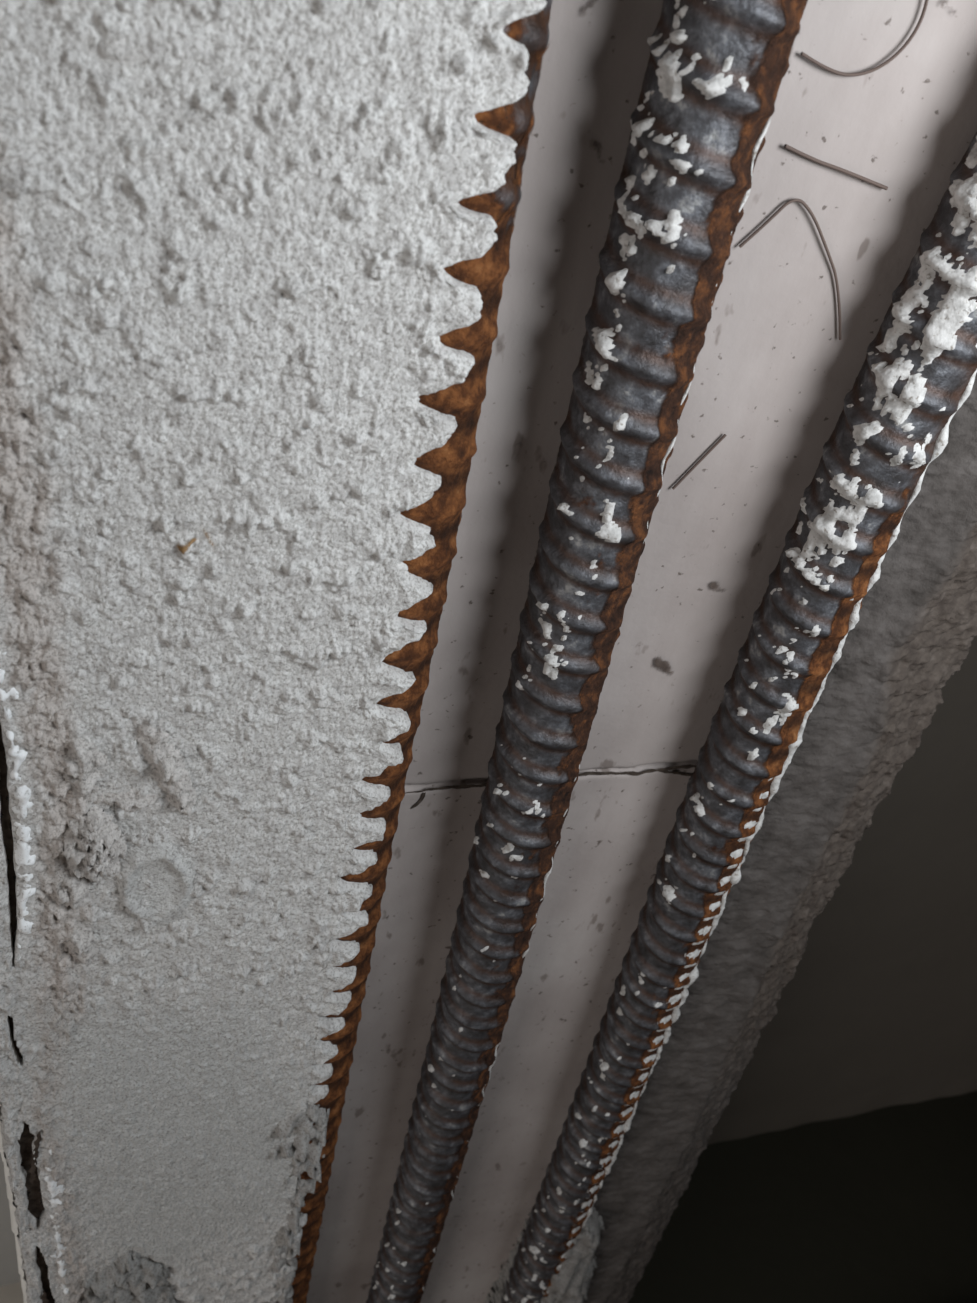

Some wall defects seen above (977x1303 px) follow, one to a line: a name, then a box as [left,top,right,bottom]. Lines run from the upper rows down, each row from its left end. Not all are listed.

crack [0,723,17,947]
crack [8,1016,23,1059]
peeling [0,651,41,967]
corrosion [177,533,213,554]
corrosion [289,189,516,1303]
spalling [264,0,749,1303]
corrosion [414,0,808,1303]
crack [578,765,696,776]
spalling [421,0,977,1303]
corrosion [541,488,910,1301]
crack [17,1123,55,1303]
spalling [44,1149,177,1303]